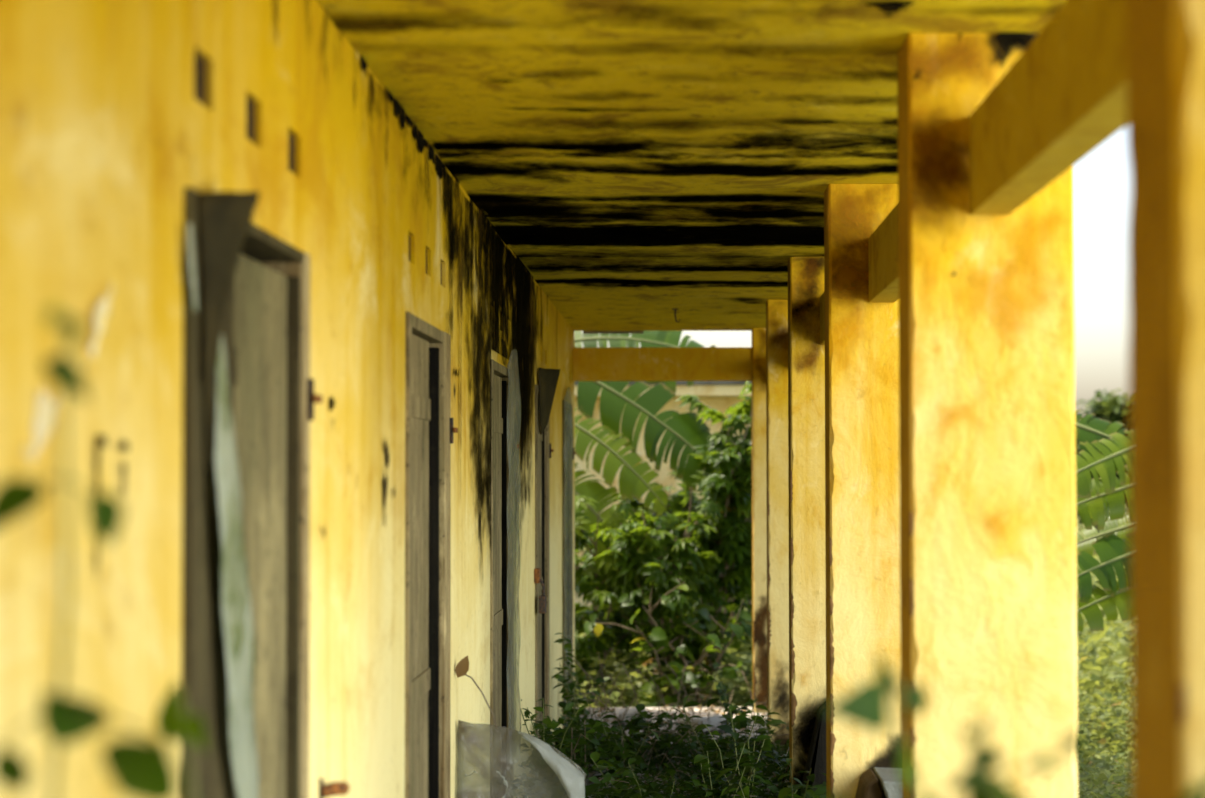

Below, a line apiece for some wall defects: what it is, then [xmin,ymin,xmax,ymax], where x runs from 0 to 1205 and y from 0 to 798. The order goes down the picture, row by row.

leakage [853,34,980,82]
leakage [914,127,962,208]
leakage [422,120,898,552]